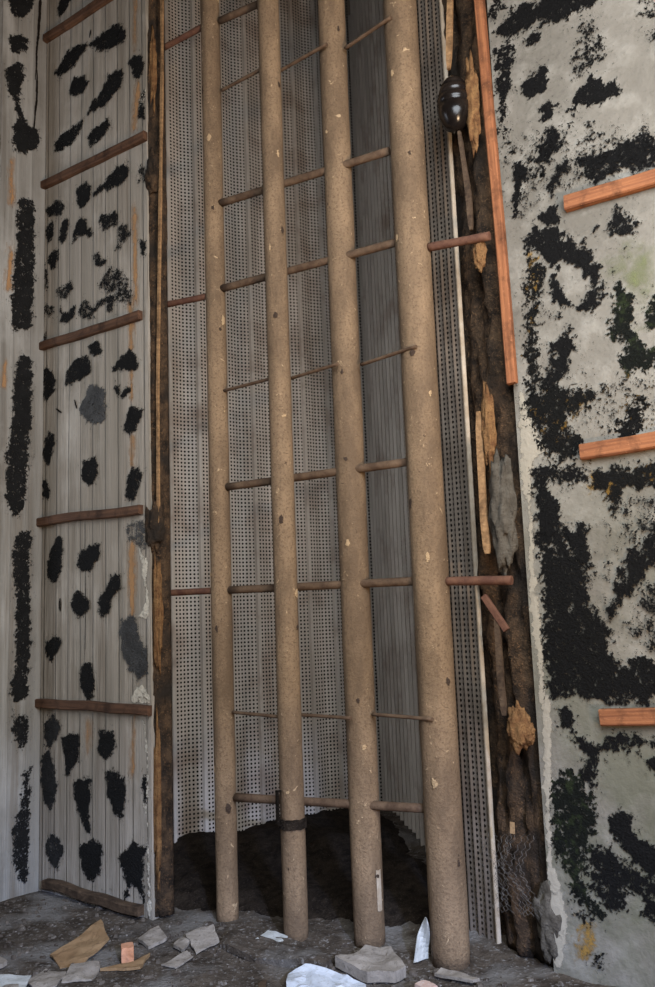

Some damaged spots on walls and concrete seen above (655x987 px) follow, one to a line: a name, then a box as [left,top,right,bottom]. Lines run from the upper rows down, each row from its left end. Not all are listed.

leakage [564,8,614,82]
leakage [498,102,655,222]
leakage [521,273,655,664]